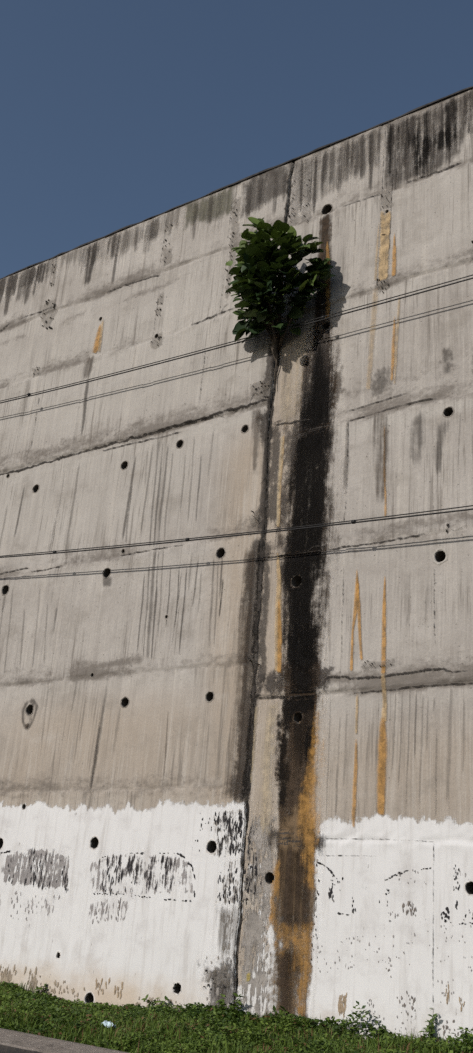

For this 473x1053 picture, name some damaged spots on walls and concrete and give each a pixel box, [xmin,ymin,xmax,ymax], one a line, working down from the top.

damp [385,92,473,187]
crack [284,162,295,223]
damp [300,161,332,265]
corrosion [379,212,396,281]
crack [344,393,434,514]
crack [0,352,420,1008]
damp [233,279,336,1018]
corrosion [350,574,362,670]
corrosion [378,579,387,814]
peeling [1,848,69,921]
peeling [90,852,195,923]
peeling [201,809,277,1015]